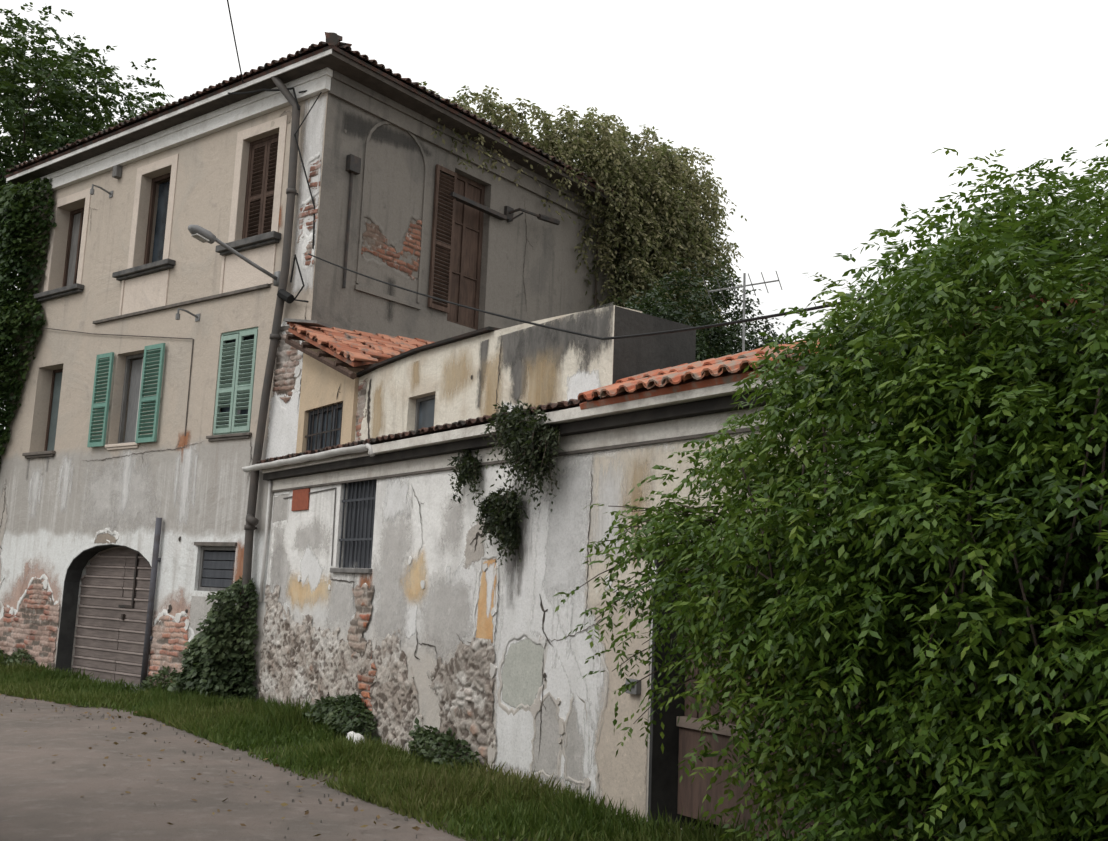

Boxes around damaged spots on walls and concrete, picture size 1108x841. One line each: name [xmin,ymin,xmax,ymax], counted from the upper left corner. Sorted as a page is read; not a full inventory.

peeling [293,96,327,291]
leakage [445,302,613,416]
leakage [26,454,74,516]
leakage [84,450,156,535]
leakage [174,446,197,523]
flaking render [0,482,61,671]
flaking render [148,596,219,689]
flaking render [257,492,650,822]
crack [538,459,612,759]